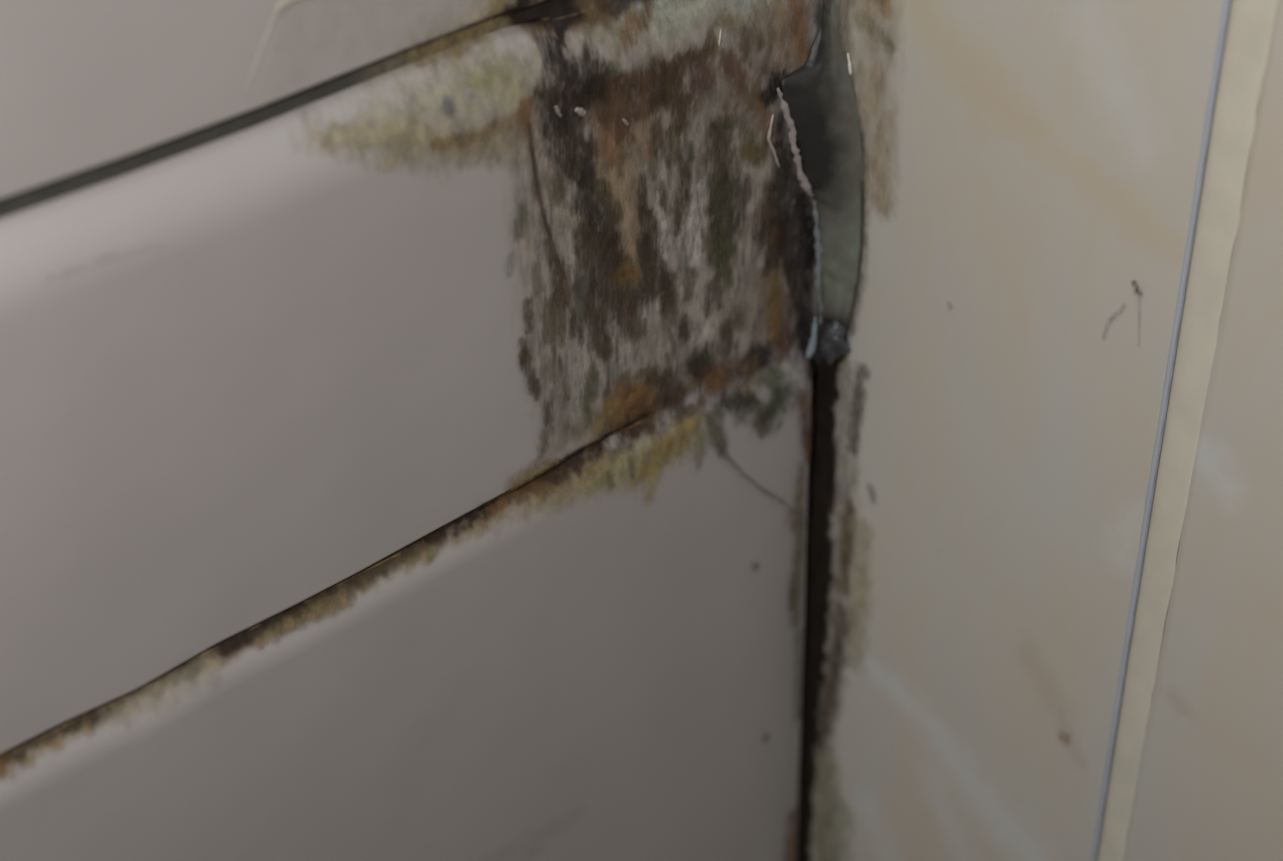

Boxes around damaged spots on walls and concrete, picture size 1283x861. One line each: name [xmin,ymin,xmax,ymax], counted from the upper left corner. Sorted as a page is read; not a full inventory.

damp [323,0,816,501]
damp [846,169,865,333]
corrosion [0,379,664,776]
damp [813,361,874,861]